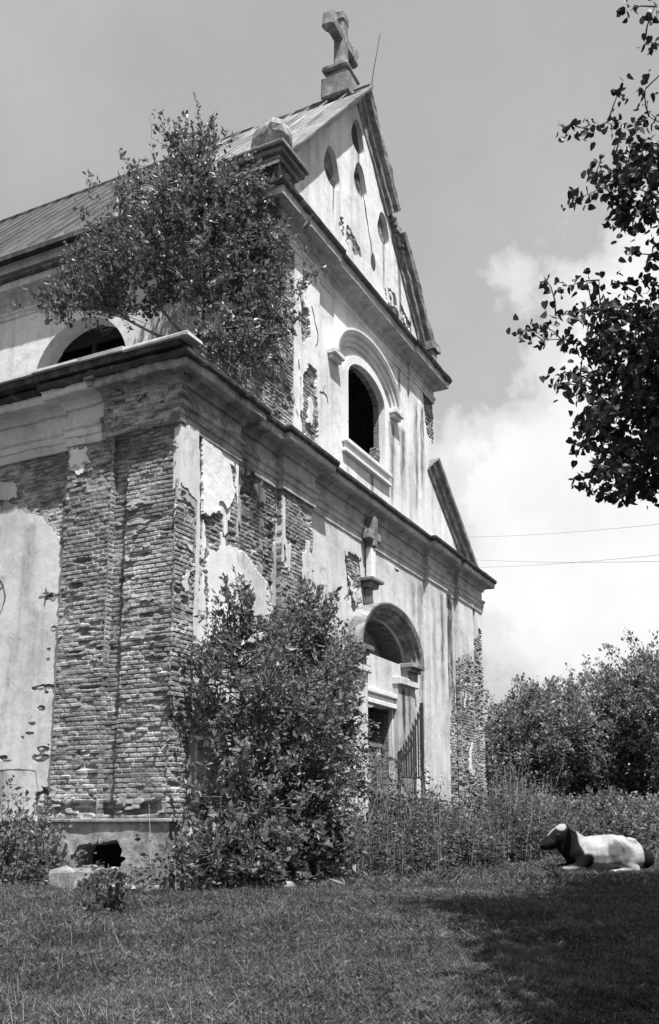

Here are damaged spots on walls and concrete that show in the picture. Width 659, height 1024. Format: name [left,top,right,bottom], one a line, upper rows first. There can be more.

flaking render [265,237,316,443]
flaking render [0,437,91,559]
flaking render [165,438,314,818]
flaking render [344,552,359,610]
spalling [21,684,54,739]
spalling [32,743,50,762]
flaking render [450,631,488,821]